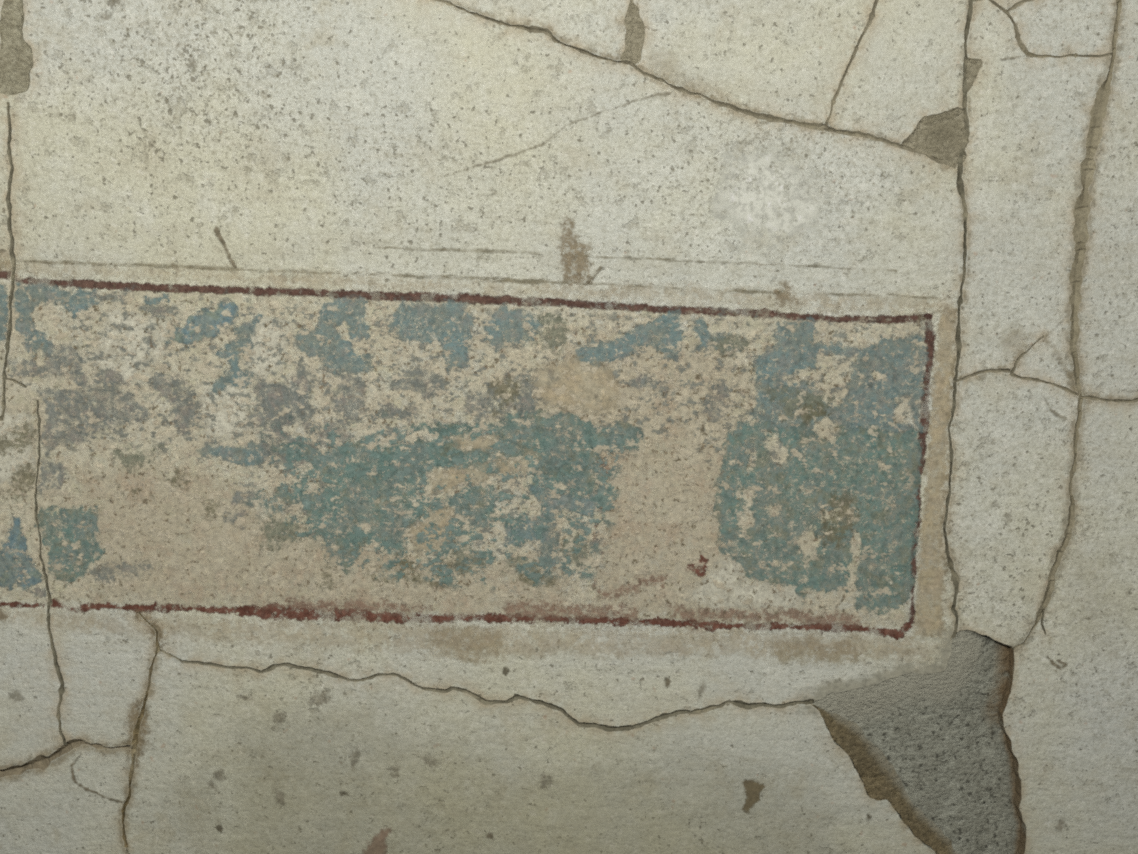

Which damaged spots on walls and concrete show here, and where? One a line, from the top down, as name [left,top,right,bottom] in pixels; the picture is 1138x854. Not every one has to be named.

crack [0,102,814,847]
crack [434,0,1138,650]
spalling [804,630,1026,854]